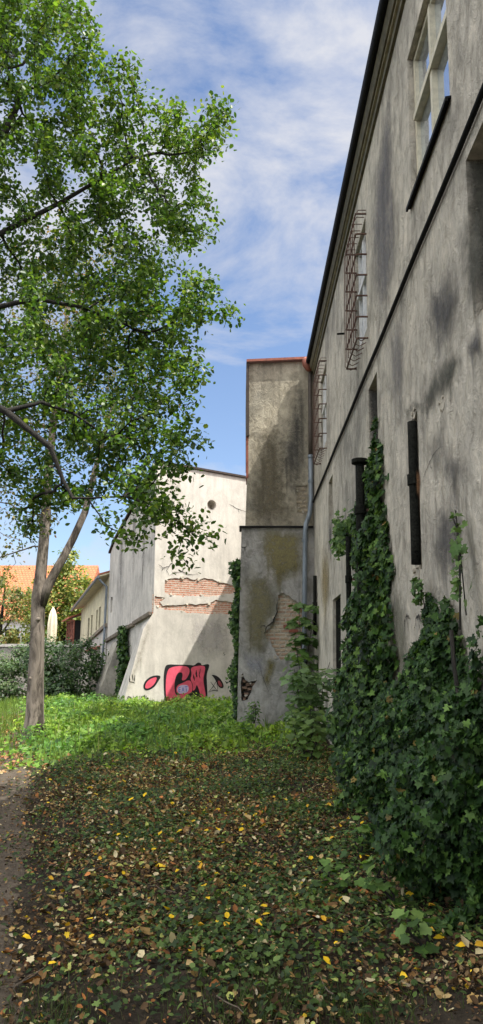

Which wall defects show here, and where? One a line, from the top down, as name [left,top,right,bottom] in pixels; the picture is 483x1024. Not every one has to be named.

leakage [257,417,300,517]
peeling [152,576,235,615]
flaking render [263,593,302,661]